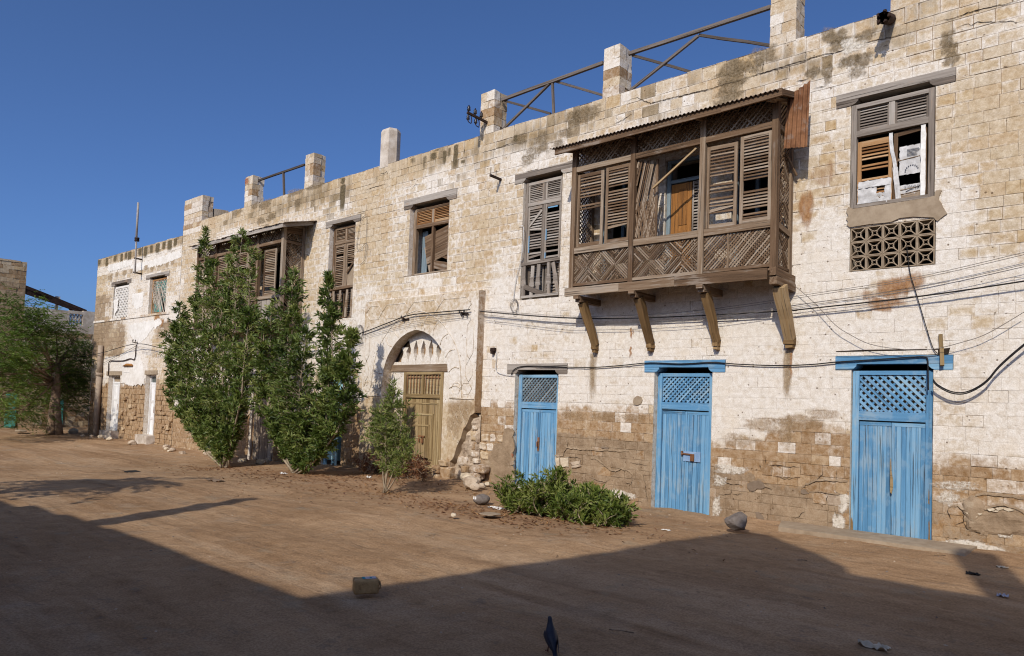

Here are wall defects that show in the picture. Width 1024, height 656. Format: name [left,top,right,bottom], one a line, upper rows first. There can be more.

mould [714,44,776,105]
mould [805,28,875,82]
water stain [941,30,960,67]
rust [799,193,813,222]
rust [866,275,923,311]
spalling [431,415,515,480]
spalling [555,457,581,468]
spalling [747,465,847,506]
crack [947,492,1024,534]
spalling [964,507,1024,538]